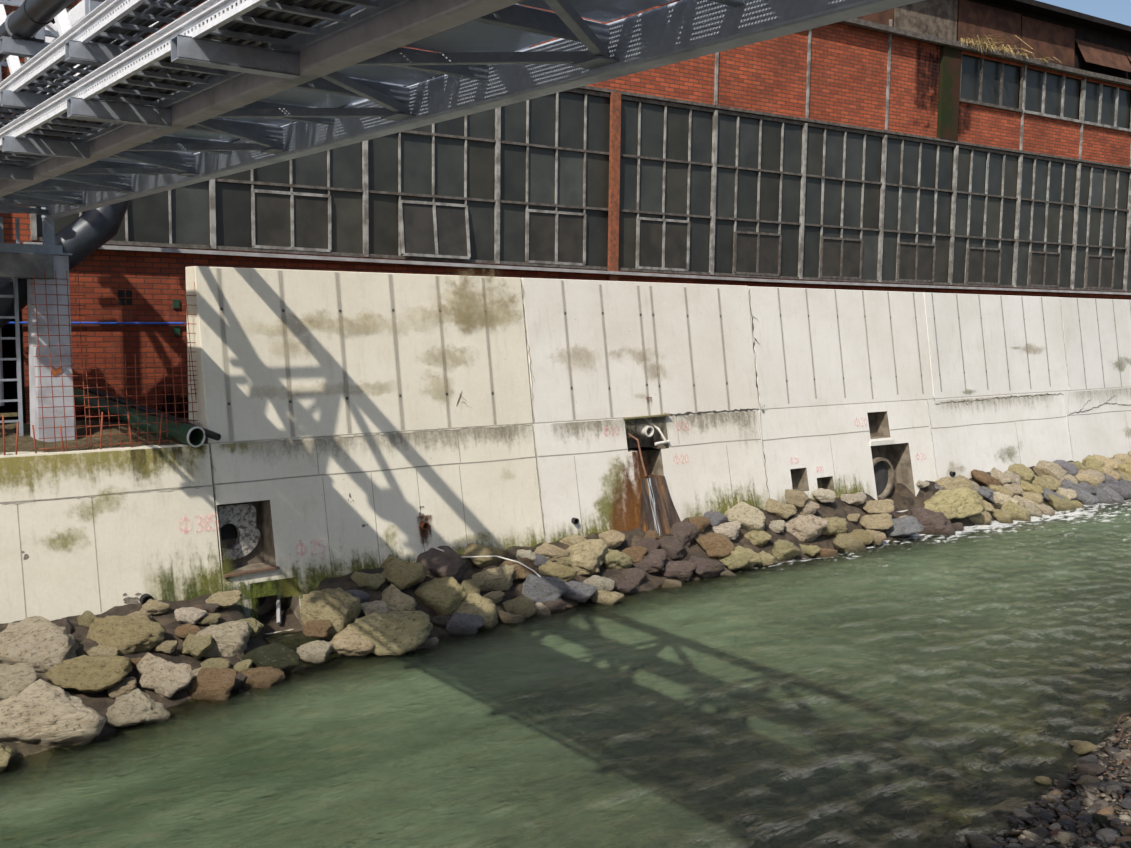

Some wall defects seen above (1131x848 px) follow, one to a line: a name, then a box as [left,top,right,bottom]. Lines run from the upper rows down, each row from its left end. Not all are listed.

crack [927,299,1127,476]
water stain [0,447,182,486]
water stain [222,442,248,452]
corrosion [612,451,646,531]
corrosion [417,515,431,543]
water stain [162,567,281,620]